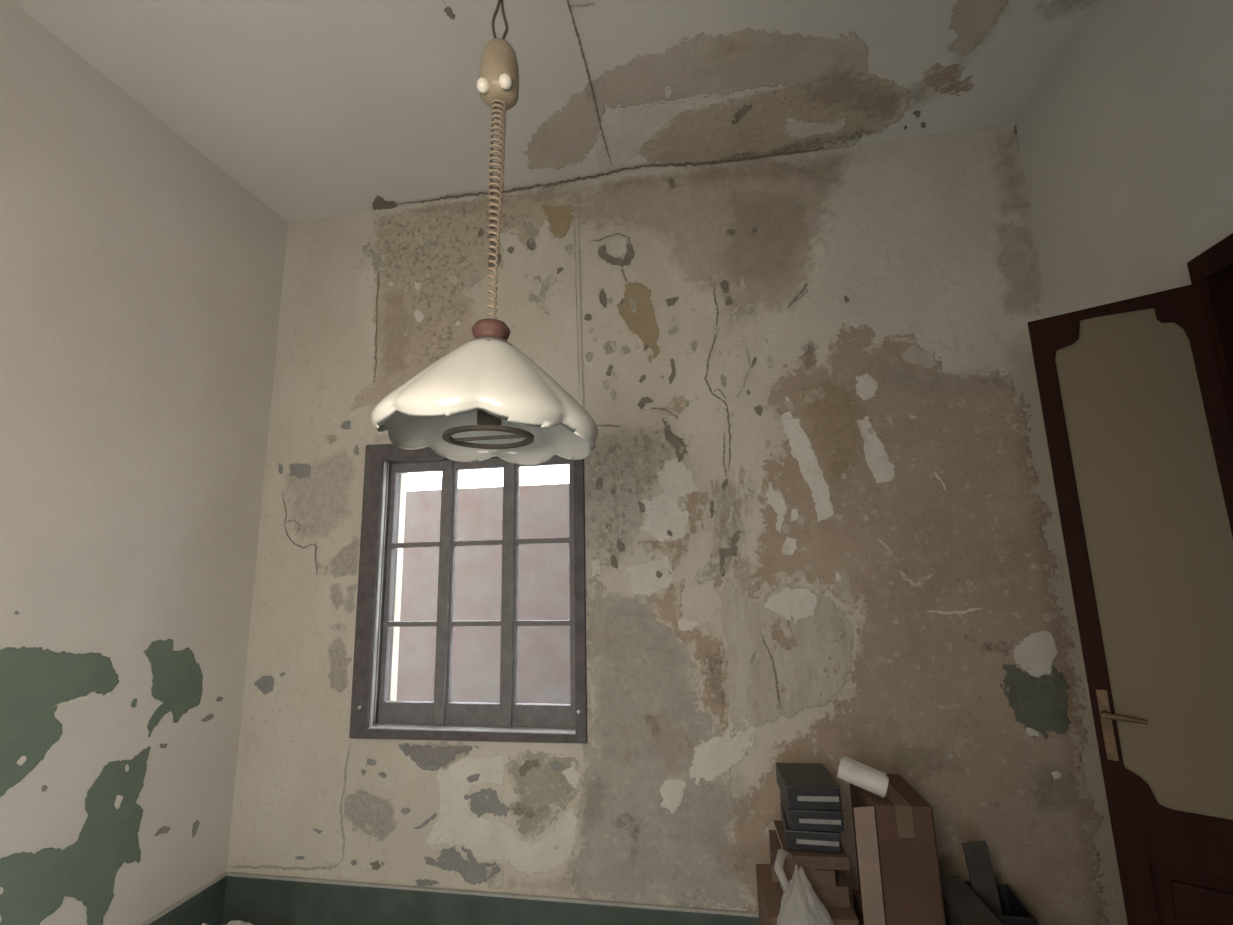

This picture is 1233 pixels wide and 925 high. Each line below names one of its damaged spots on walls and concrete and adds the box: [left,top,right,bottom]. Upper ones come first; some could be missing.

spalling [523,0,1008,189]
crack [372,0,1009,407]
peeling [278,463,311,479]
peeling [282,490,329,575]
peeling [324,186,574,444]
spalling [584,233,699,419]
water stain [637,418,687,512]
crack [704,274,751,474]
spalling [627,322,1109,925]
peeling [0,639,223,925]
peeling [351,860,384,871]
peeling [414,750,582,889]